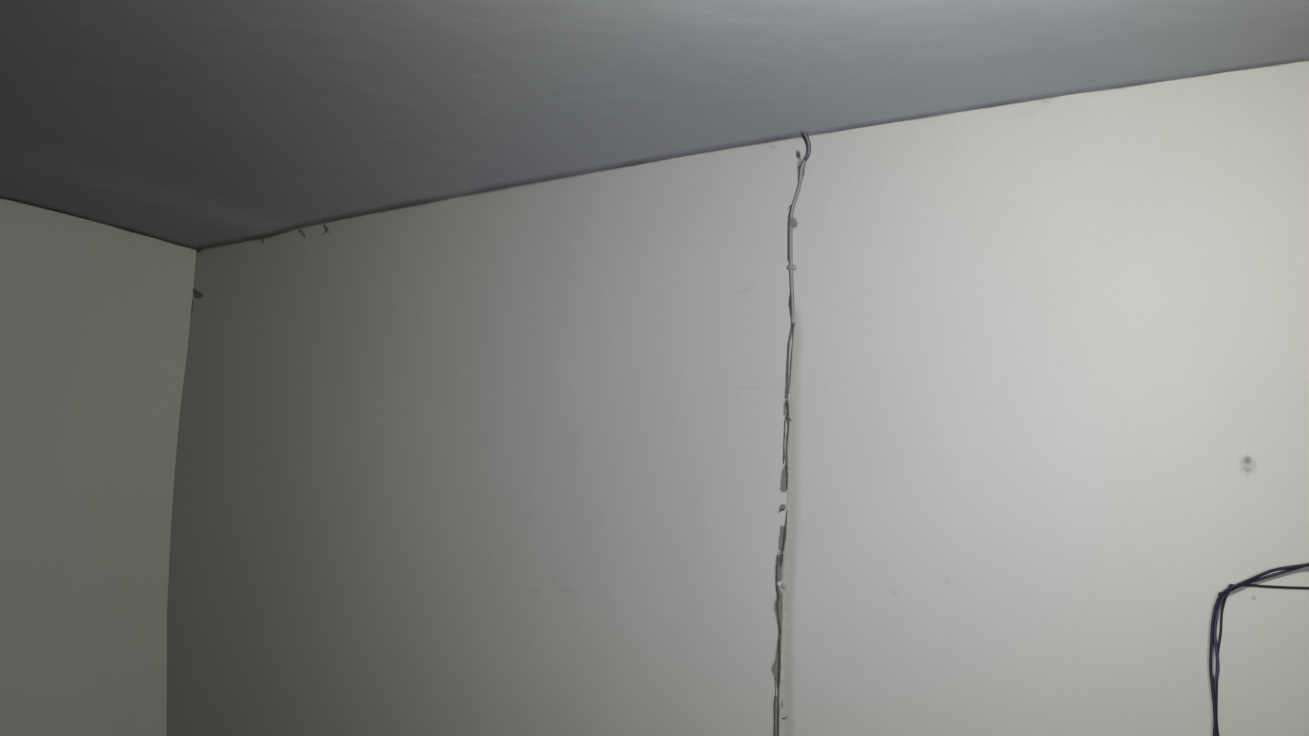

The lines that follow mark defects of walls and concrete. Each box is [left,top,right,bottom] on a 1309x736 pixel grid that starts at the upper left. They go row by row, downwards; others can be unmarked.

crack [772,151,804,736]